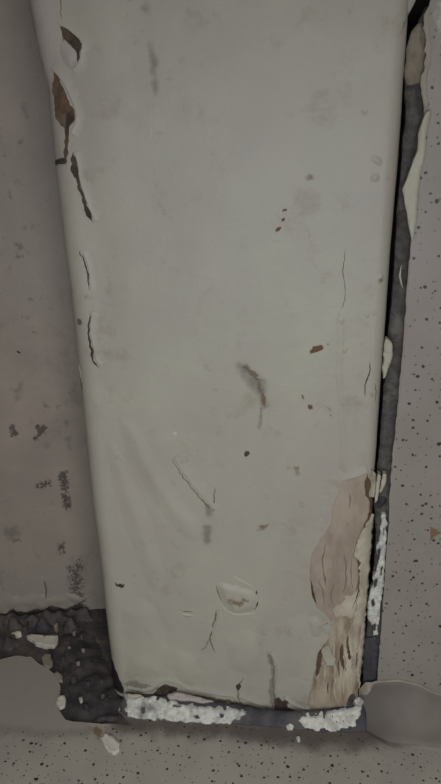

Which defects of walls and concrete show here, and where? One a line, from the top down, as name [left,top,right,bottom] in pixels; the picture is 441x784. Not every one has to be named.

crack [70,152,101,222]
peeling [402,110,430,242]
crack [79,251,97,290]
crack [77,312,105,387]
peeling [119,461,387,711]
water stain [118,717,382,745]